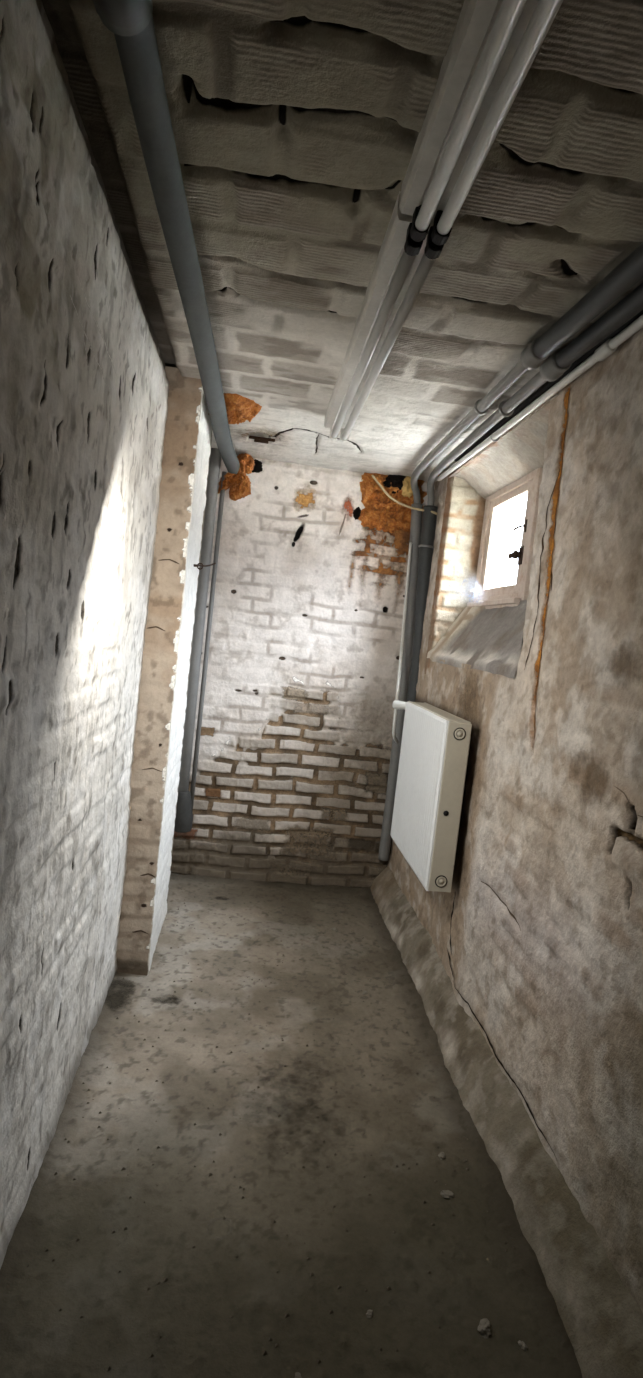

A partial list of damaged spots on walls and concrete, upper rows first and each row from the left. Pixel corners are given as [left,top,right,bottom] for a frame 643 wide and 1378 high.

crack [524,393,570,751]
spalling [174,677,392,867]
spalling [611,786,643,853]
crack [447,881,557,1160]